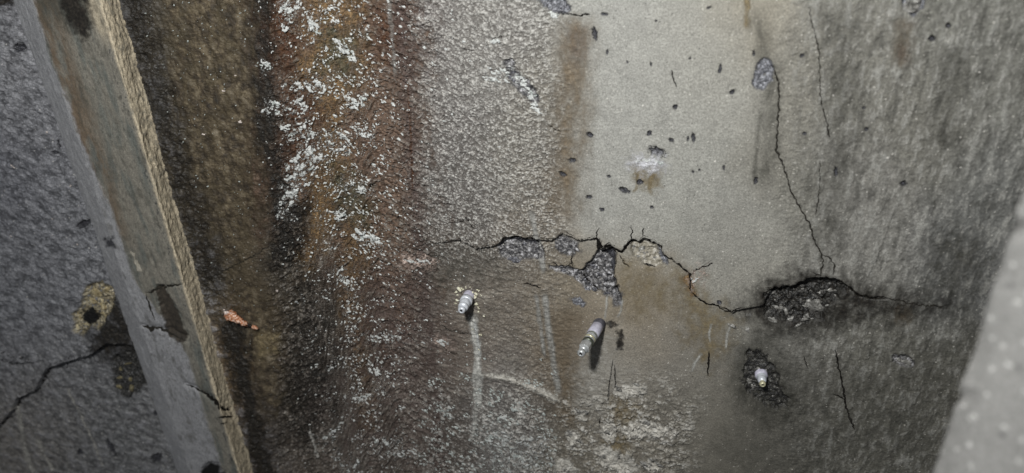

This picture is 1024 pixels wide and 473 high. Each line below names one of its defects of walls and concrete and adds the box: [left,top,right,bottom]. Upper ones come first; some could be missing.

crack [765,7,942,308]
spalling [72,281,115,334]
water stain [253,0,374,442]
efflorescence [351,225,385,245]
spalling [498,234,620,307]
crack [420,200,741,312]
spalling [764,277,846,328]
crack [0,339,112,427]
spalling [742,349,790,408]
crack [834,350,855,430]